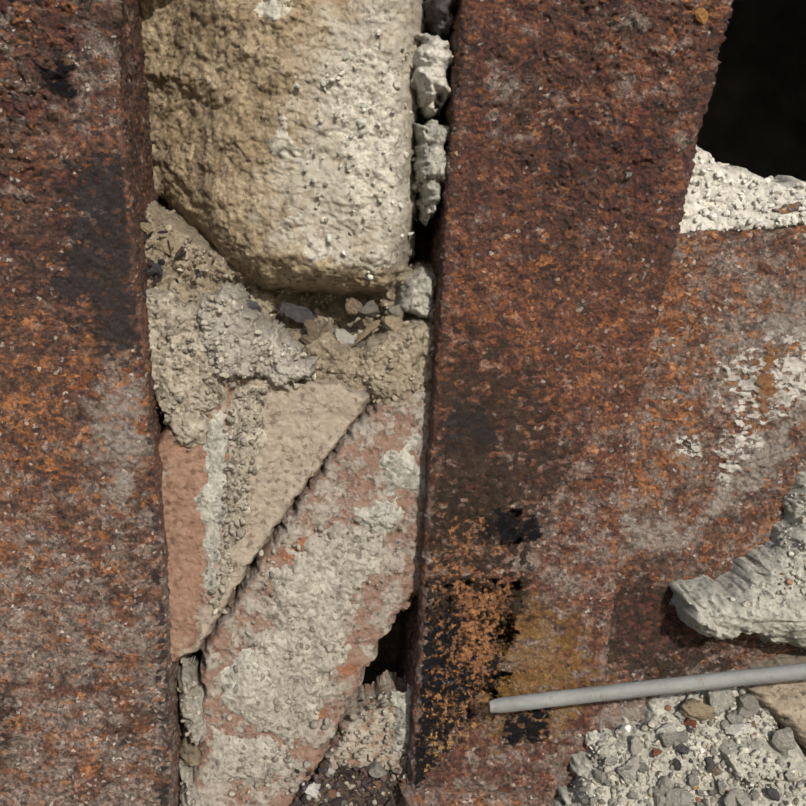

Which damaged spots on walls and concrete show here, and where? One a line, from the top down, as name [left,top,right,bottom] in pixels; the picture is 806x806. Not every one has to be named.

rust [694,7,709,24]
rust [750,344,779,428]
peeling [353,433,423,534]
peeling [414,474,543,788]
rust [605,569,733,682]
peeling [502,708,552,748]